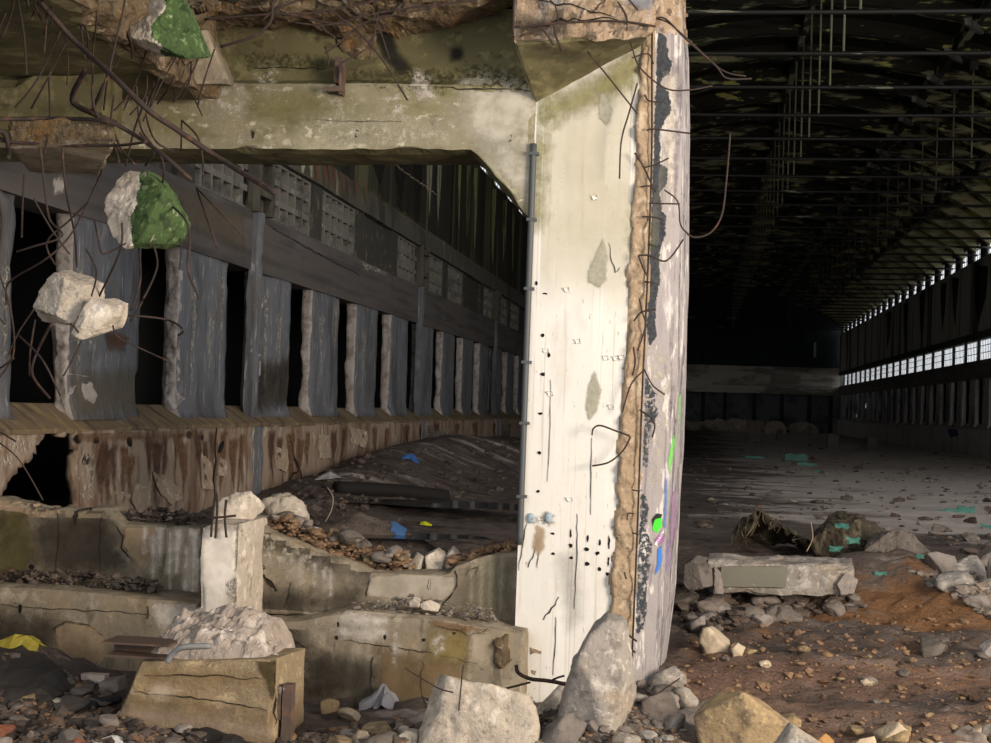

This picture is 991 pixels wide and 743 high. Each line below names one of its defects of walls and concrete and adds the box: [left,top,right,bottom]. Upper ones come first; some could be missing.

damp [376,34,410,74]
spalling [0,0,478,413]
spalling [510,0,752,662]
spalling [0,431,60,520]
rust [78,432,244,499]
rust [268,433,310,480]
rust [331,430,346,460]